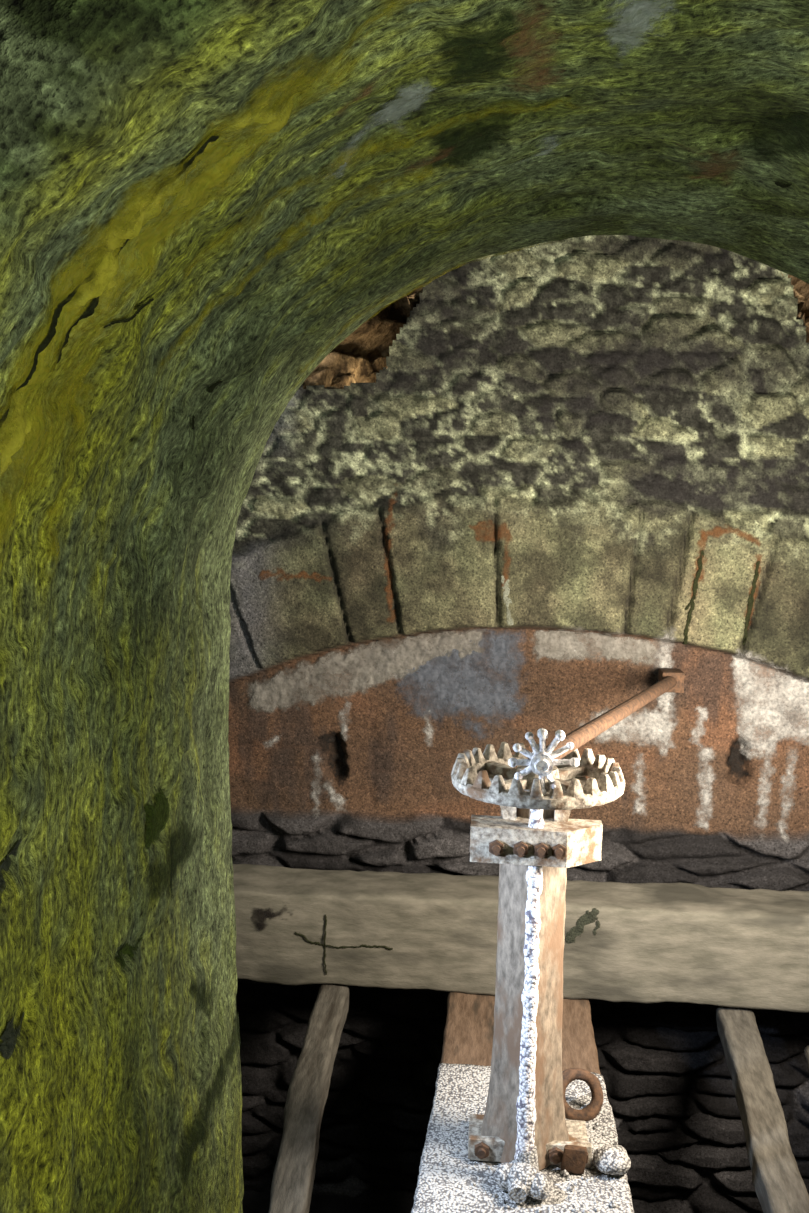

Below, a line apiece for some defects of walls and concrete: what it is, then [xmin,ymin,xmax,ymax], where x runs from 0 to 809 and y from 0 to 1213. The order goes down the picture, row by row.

crack [0,135,219,428]
leakage [656,635,674,668]
leakage [598,692,675,754]
leakage [633,762,644,812]
leakage [692,707,713,828]
leakage [733,652,809,818]